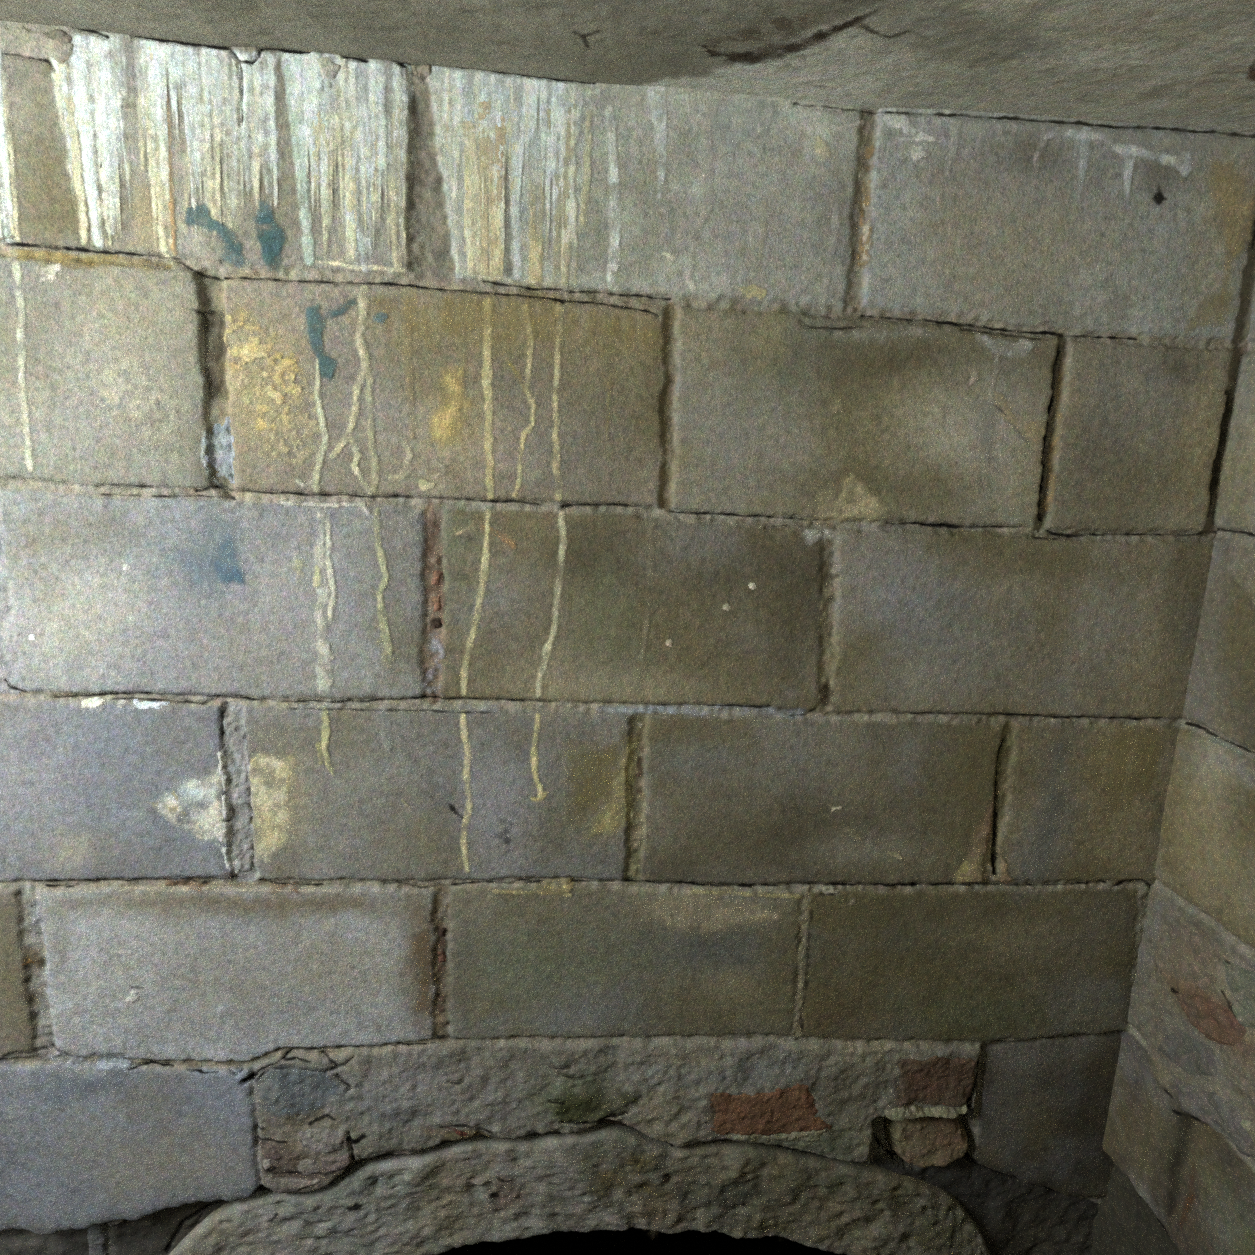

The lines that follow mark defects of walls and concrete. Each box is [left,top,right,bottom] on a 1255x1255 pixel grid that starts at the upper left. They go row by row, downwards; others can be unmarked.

leakage [0,0,883,291]
leakage [13,262,33,471]
leakage [224,286,445,693]
leakage [443,298,562,697]
leakage [556,493,566,562]
crack [32,876,332,893]
leakage [158,768,223,851]
leakage [249,731,295,862]
leakage [460,711,472,872]
leakage [531,714,546,801]
crack [706,705,816,716]
crack [381,712,1255,896]